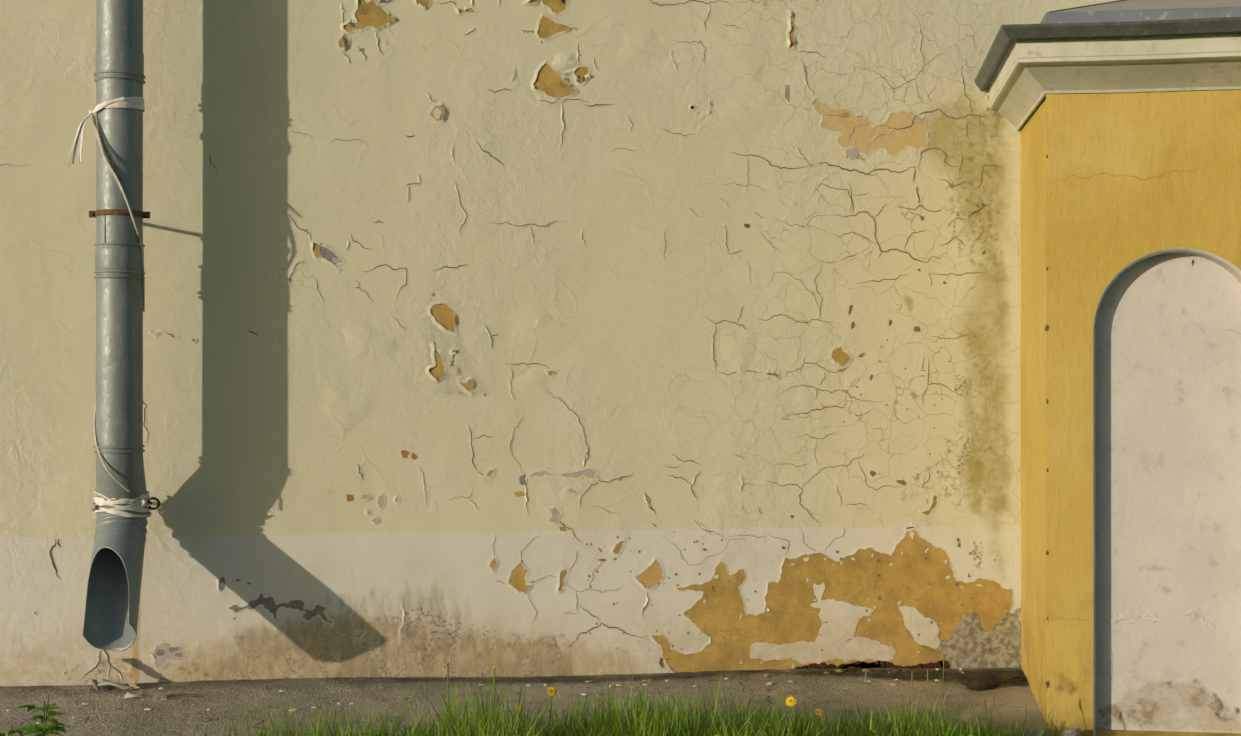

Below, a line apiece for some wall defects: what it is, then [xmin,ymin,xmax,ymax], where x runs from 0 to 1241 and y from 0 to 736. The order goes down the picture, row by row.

peeling [334,0,399,65]
peeling [412,0,479,16]
peeling [497,0,601,150]
crack [647,0,788,72]
peeling [784,8,929,160]
peeling [425,292,486,397]
crack [417,12,1003,649]
flaking render [216,574,335,629]
leakage [233,608,713,682]
peeling [486,492,1015,673]